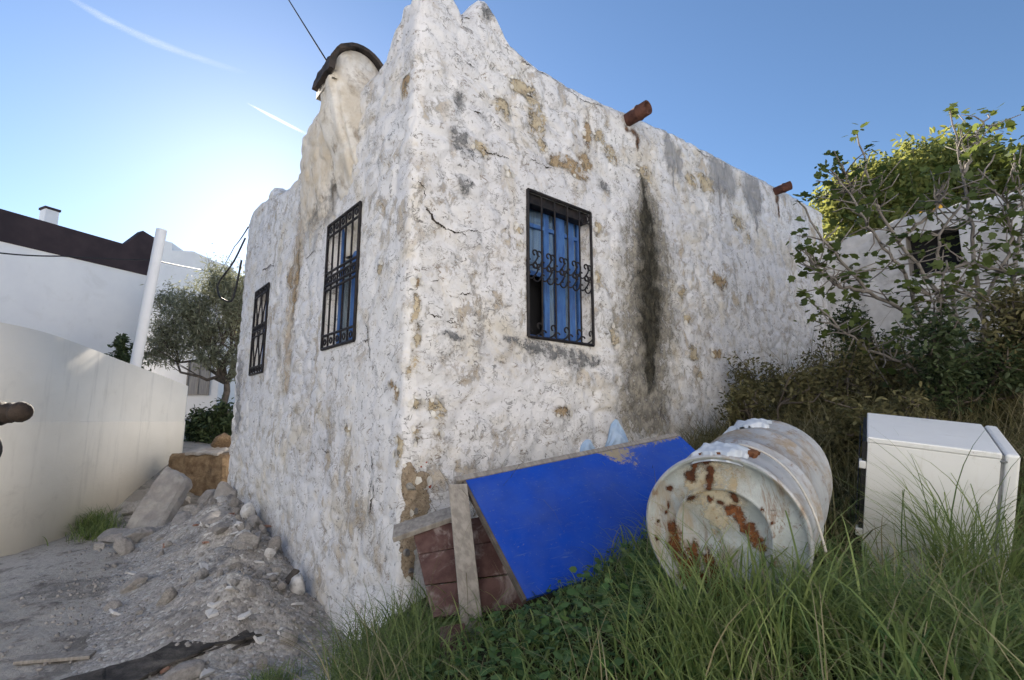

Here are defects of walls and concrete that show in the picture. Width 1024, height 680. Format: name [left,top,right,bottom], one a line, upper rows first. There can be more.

crack [418,181,482,235]
water stain [664,132,683,186]
water stain [709,156,761,230]
water stain [614,176,680,437]
spalling [392,425,433,523]
spalling [399,536,418,583]